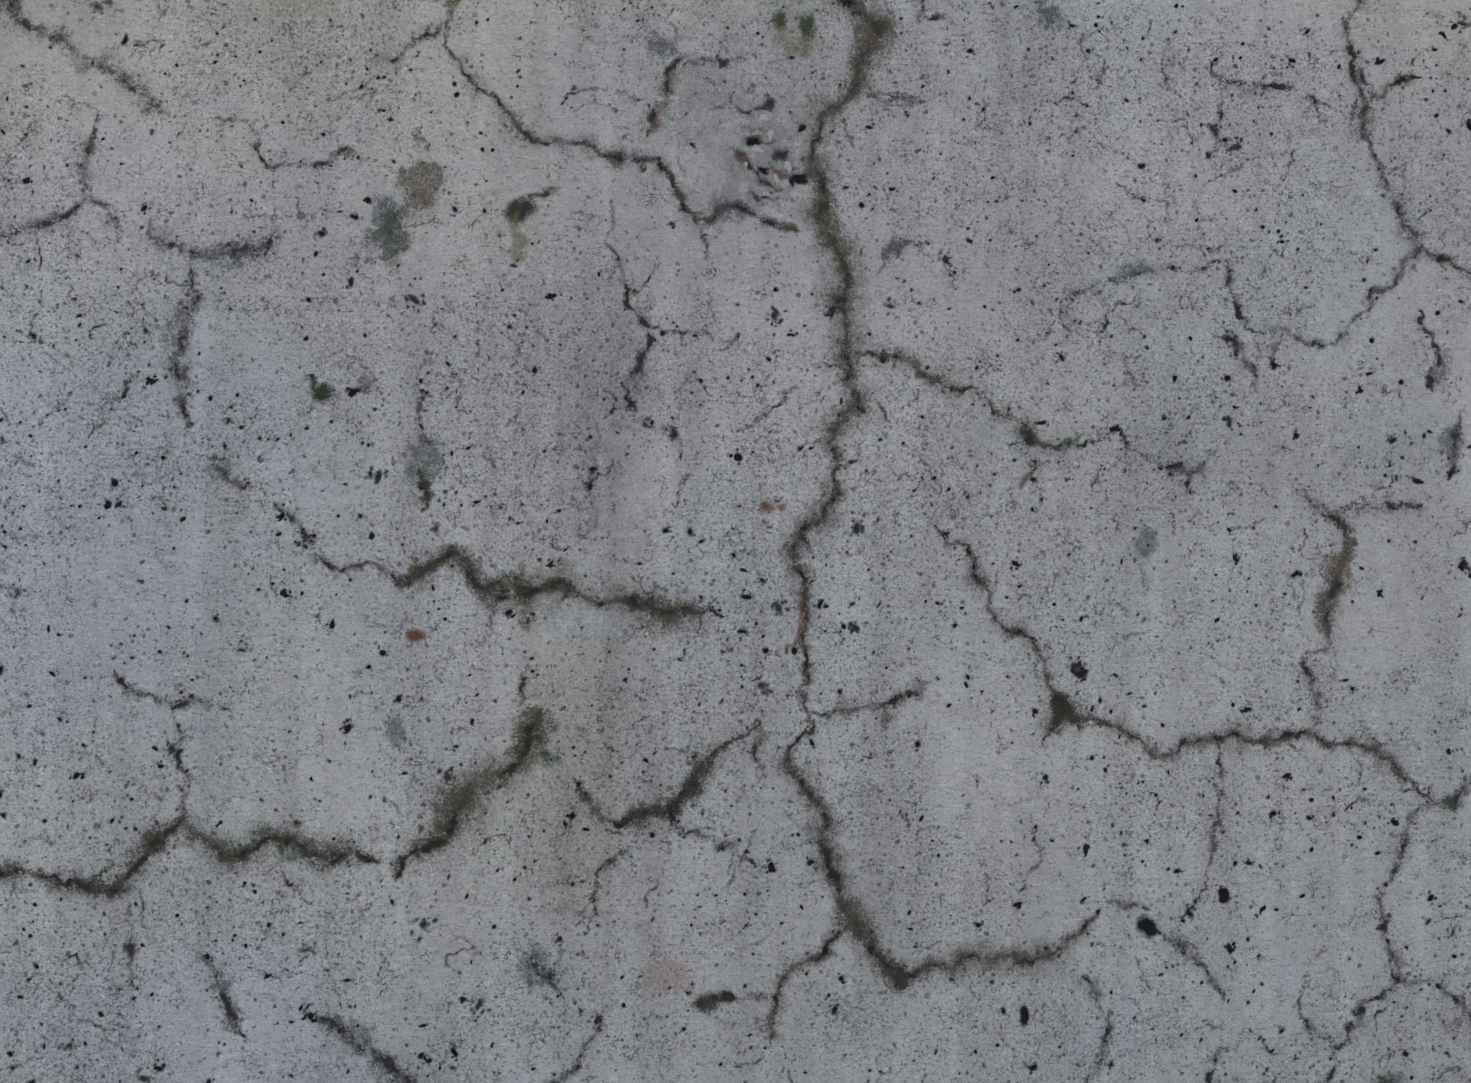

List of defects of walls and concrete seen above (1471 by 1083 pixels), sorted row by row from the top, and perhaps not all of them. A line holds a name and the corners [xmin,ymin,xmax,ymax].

crack [0,1,723,655]
crack [393,0,1225,1083]
crack [1046,0,1471,410]
crack [1438,416,1465,474]
crack [204,899,271,1042]
crack [0,668,561,1006]
crack [304,940,471,1083]
crack [898,456,1471,1083]